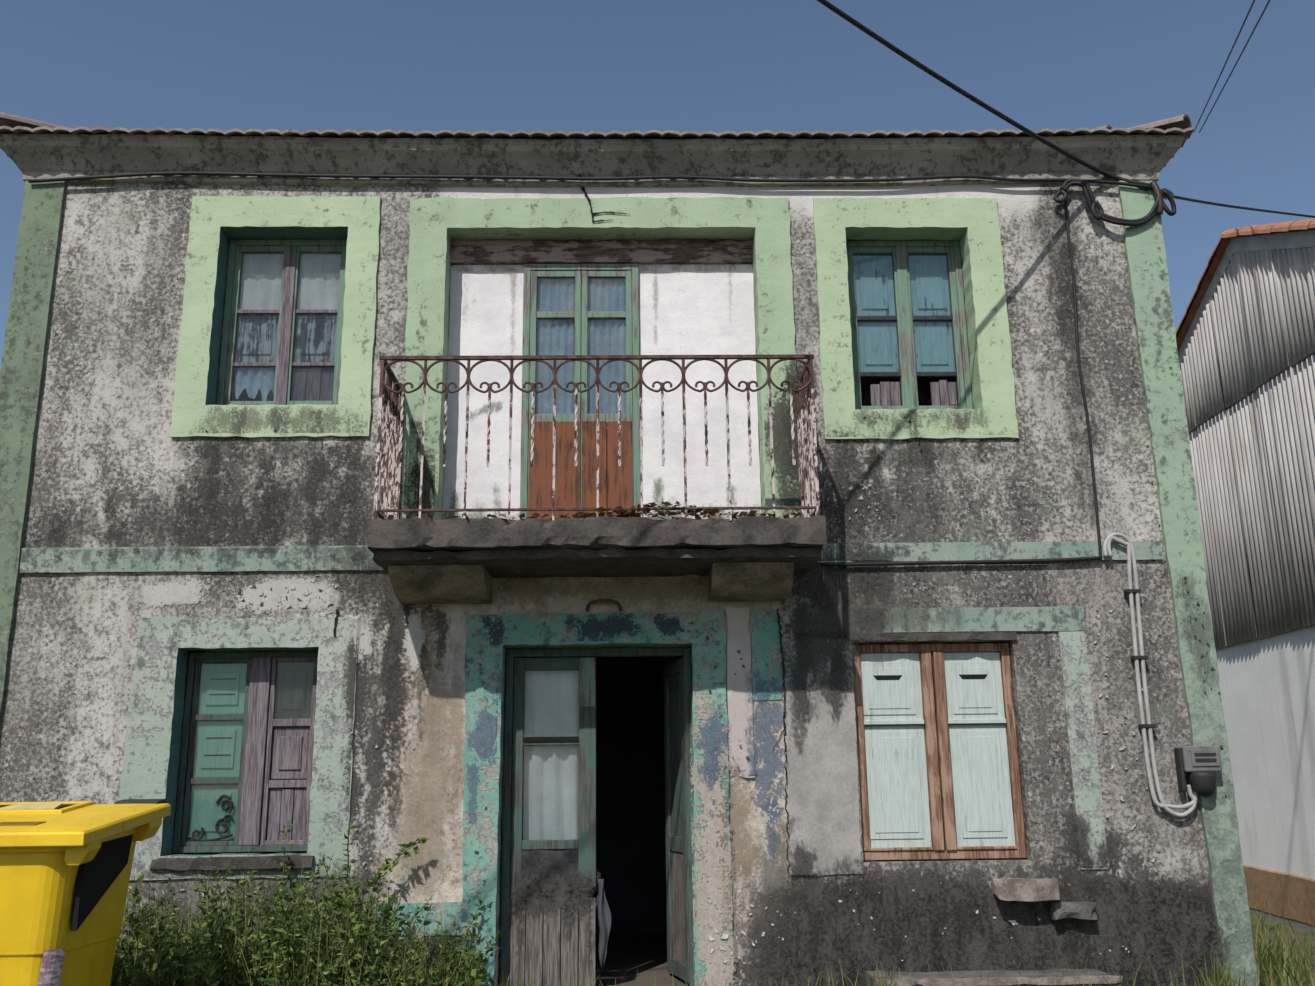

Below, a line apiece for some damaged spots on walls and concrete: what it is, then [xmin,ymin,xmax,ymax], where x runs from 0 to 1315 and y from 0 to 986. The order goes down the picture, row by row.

crack [574,174,627,222]
damp [341,556,449,890]
peeling [466,615,516,824]
peeling [565,613,693,641]
flaking render [690,650,795,986]
damp [761,360,899,752]
damp [734,812,1230,986]